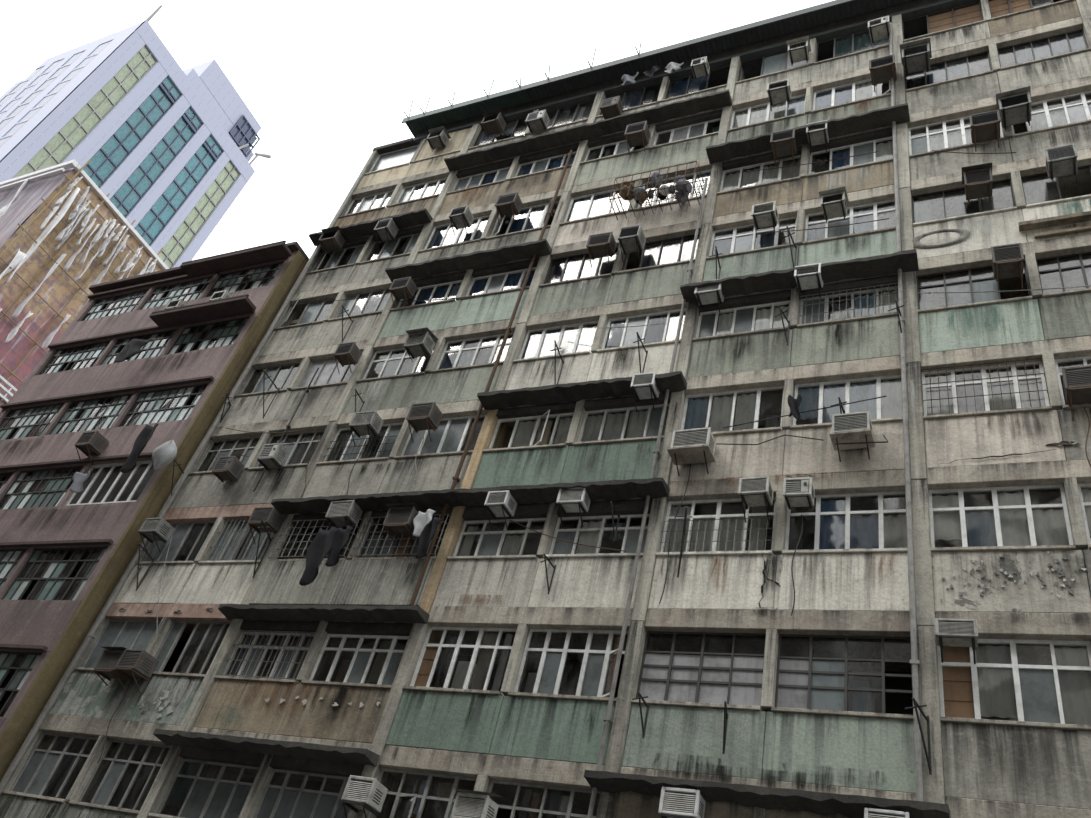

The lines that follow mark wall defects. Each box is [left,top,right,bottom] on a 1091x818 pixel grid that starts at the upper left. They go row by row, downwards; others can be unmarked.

flaking render [942,551,1087,600]
water stain [677,756,726,781]
water stain [761,764,785,787]